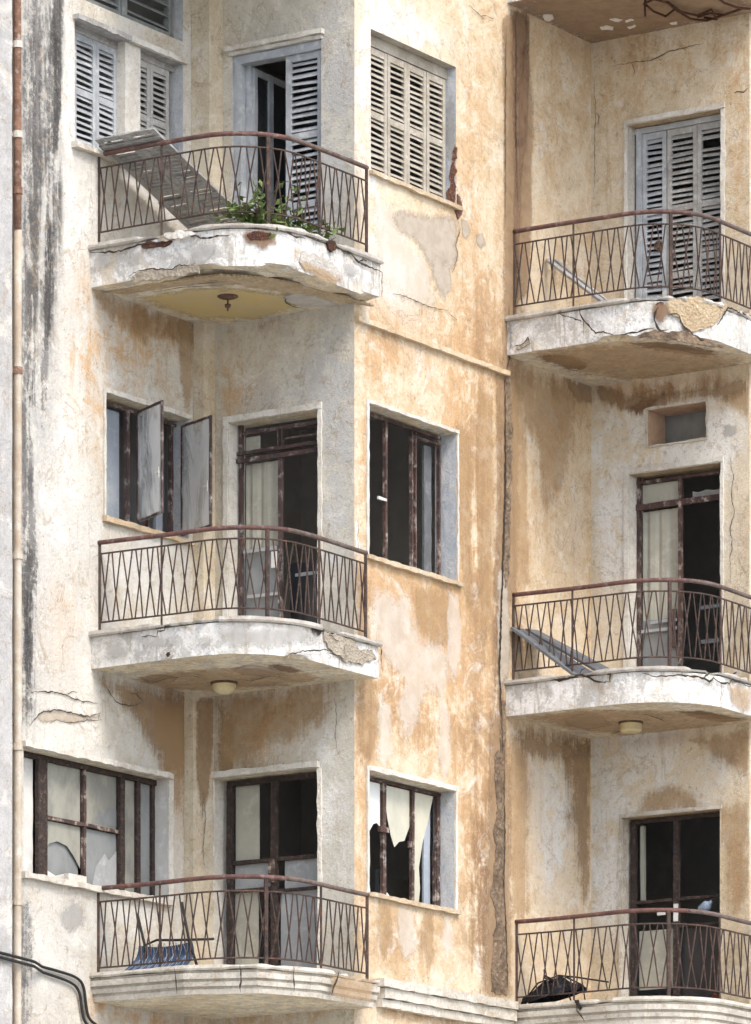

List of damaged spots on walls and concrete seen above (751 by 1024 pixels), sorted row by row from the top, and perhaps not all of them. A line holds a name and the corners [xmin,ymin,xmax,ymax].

spalling [600,0,751,30]
peeling [389,102,485,297]
crack [89,242,152,254]
crack [190,233,229,241]
corrosion [243,230,277,248]
crack [558,304,678,335]
spalling [632,296,751,358]
leakage [22,0,64,719]
leakage [566,379,746,414]
peeling [198,624,382,665]
peeling [29,709,100,726]
leakage [102,676,213,816]